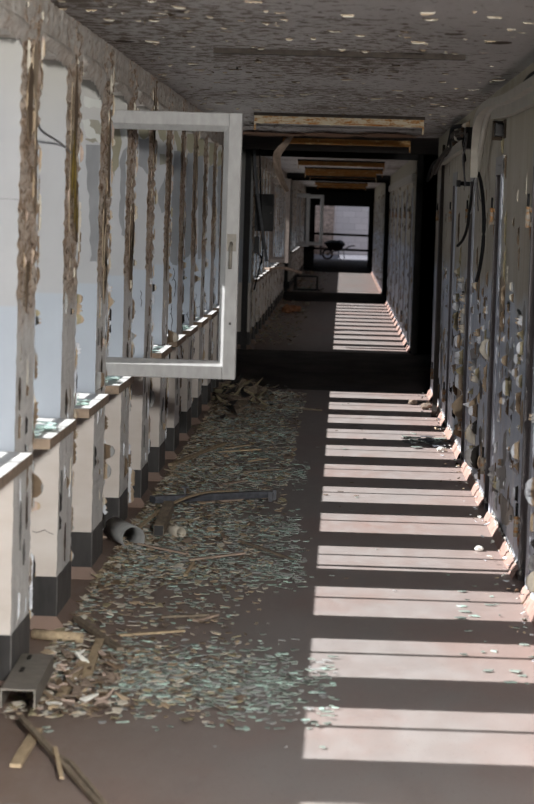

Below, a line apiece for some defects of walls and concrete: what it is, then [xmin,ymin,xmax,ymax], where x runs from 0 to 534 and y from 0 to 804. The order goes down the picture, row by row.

peeling [23,8,45,325]
peeling [65,57,224,391]
peeling [18,348,39,452]
peeling [17,461,43,622]
peeling [59,429,78,562]
peeling [65,342,81,419]
peeling [94,407,135,529]
peeling [144,377,204,460]
peeling [437,198,534,600]